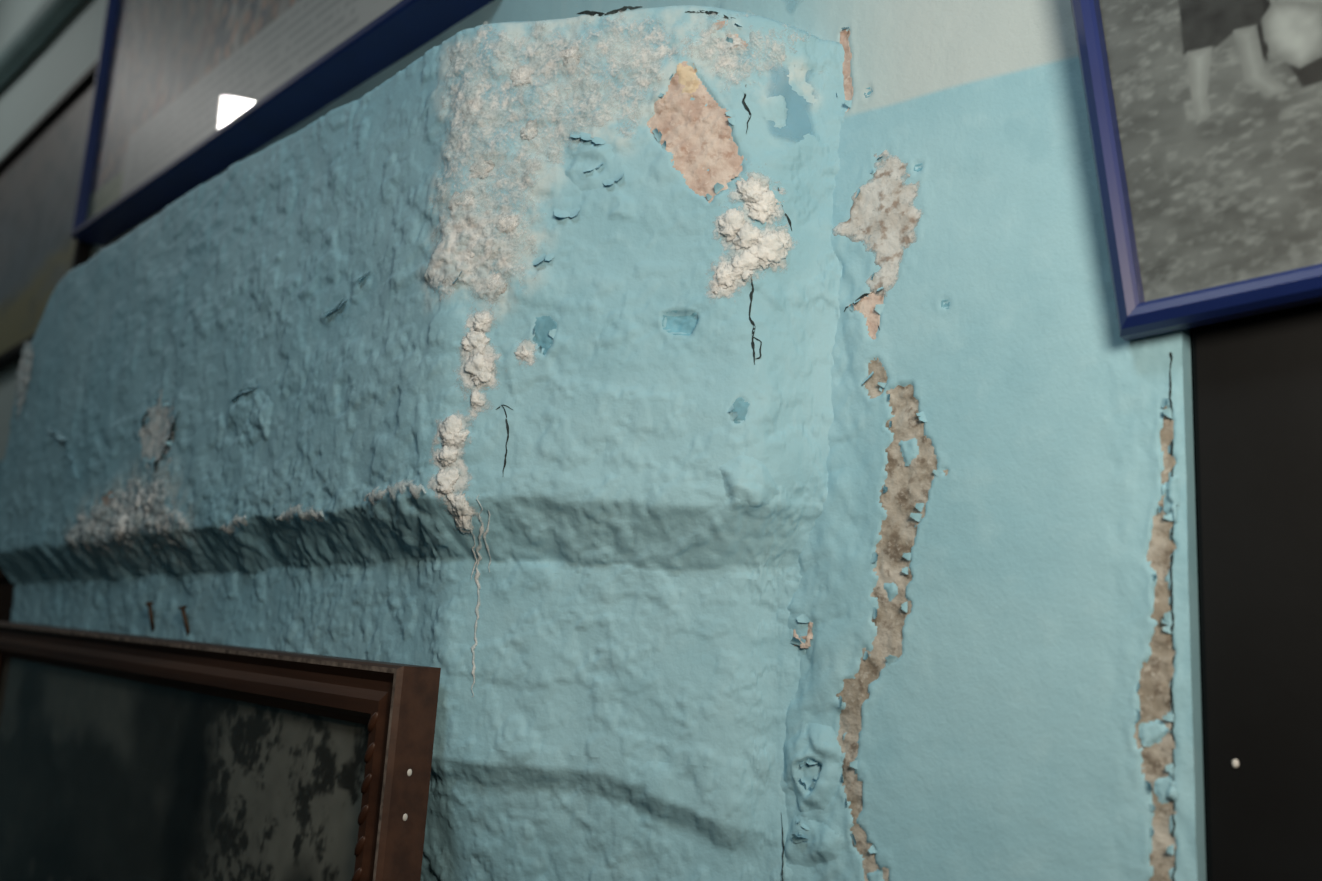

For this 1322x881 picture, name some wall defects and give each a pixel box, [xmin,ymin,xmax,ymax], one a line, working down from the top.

peeling [647,61,747,203]
peeling [138,389,177,474]
damp [364,14,804,697]
crack [749,277,762,365]
peeling [833,150,923,339]
peeling [836,358,948,881]
peeling [1134,398,1179,881]